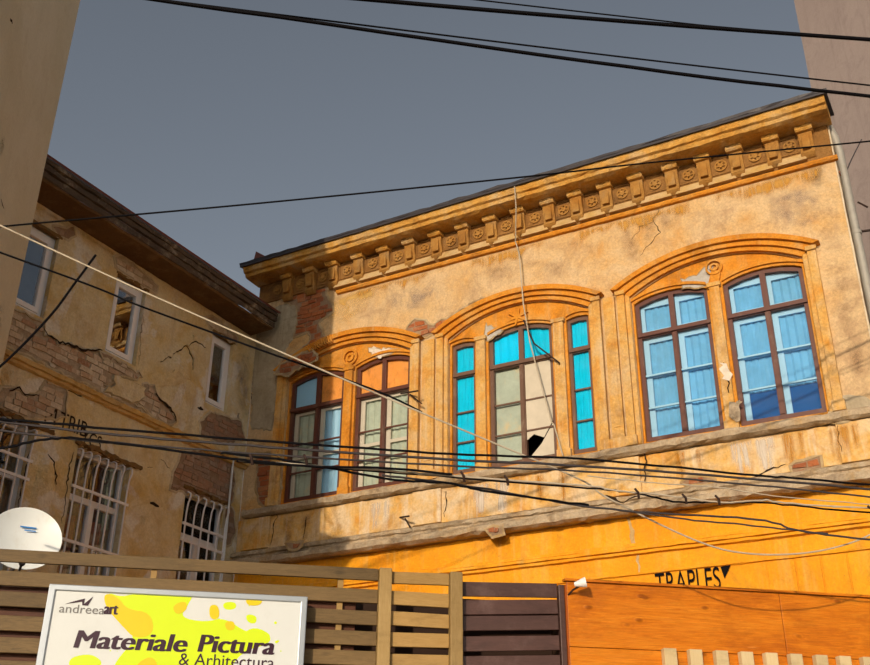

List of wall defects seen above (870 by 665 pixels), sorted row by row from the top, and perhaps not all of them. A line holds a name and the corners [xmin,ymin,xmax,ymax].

flaking render [0,308,177,426]
crack [138,315,206,372]
flaking render [273,287,335,377]
flaking render [198,410,245,443]
flaking render [169,449,237,548]